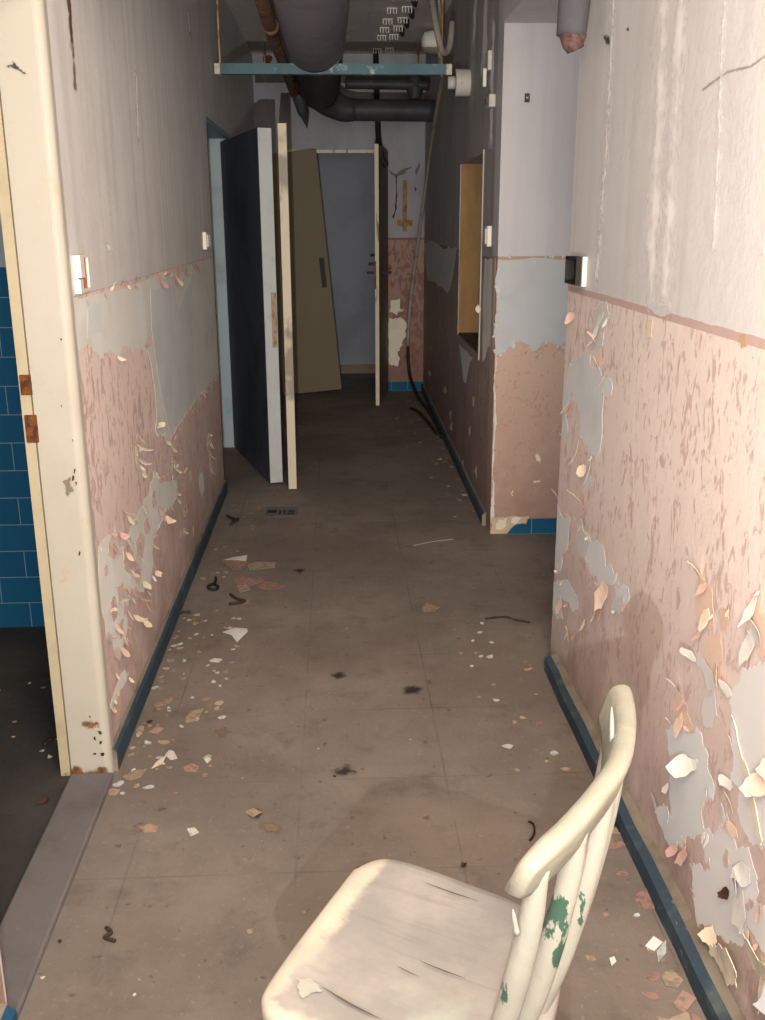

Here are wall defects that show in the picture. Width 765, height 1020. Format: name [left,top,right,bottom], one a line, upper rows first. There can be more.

peeling [388,299,407,366]
peeling [459,253,575,534]
peeling [63,469,77,496]
peeling [73,259,219,713]
peeling [551,299,630,642]
rust [71,716,107,774]
peeling [649,561,765,1020]
peeling [636,889,655,909]
peeling [645,936,666,962]